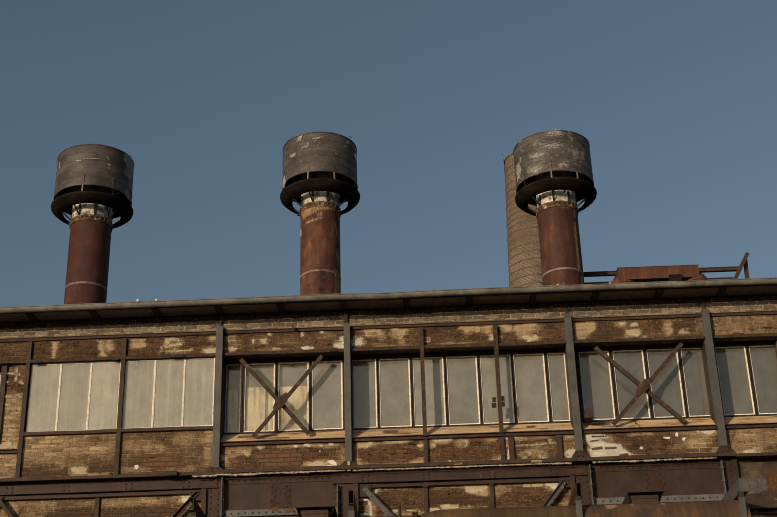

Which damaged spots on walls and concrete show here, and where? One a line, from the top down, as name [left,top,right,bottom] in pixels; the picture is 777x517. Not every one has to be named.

corrosion [300,206,337,237]
peeling [458,323,537,335]
peeling [573,321,596,337]
peeling [618,321,646,338]
peeling [97,340,114,357]
peeling [131,339,146,348]
peeling [161,338,193,353]
peeling [333,329,383,349]
peeling [584,433,710,463]